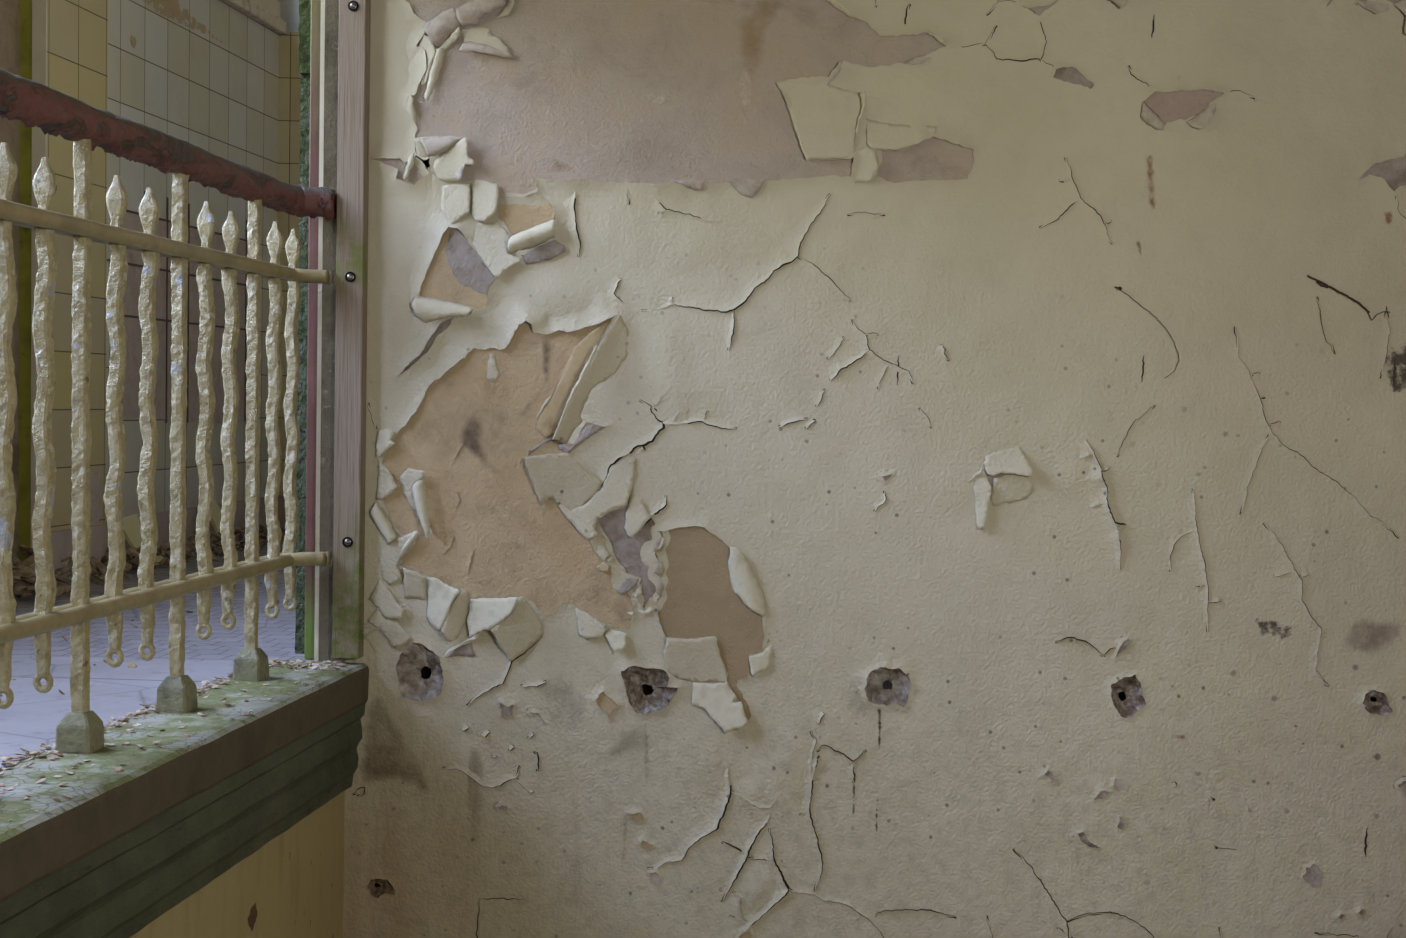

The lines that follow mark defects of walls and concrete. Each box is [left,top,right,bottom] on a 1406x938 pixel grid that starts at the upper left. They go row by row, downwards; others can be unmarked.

peeling [1132,73,1234,137]
peeling [368,0,989,734]
peeling [967,446,1035,530]
crack [1065,356,1156,570]
crack [1233,327,1400,688]
crack [1157,489,1222,632]
peeling [461,679,552,771]
crack [1055,637,1116,658]
flaking render [1103,633,1151,725]
flaking render [1349,683,1399,722]
crack [647,710,1001,938]
crack [1012,848,1154,938]